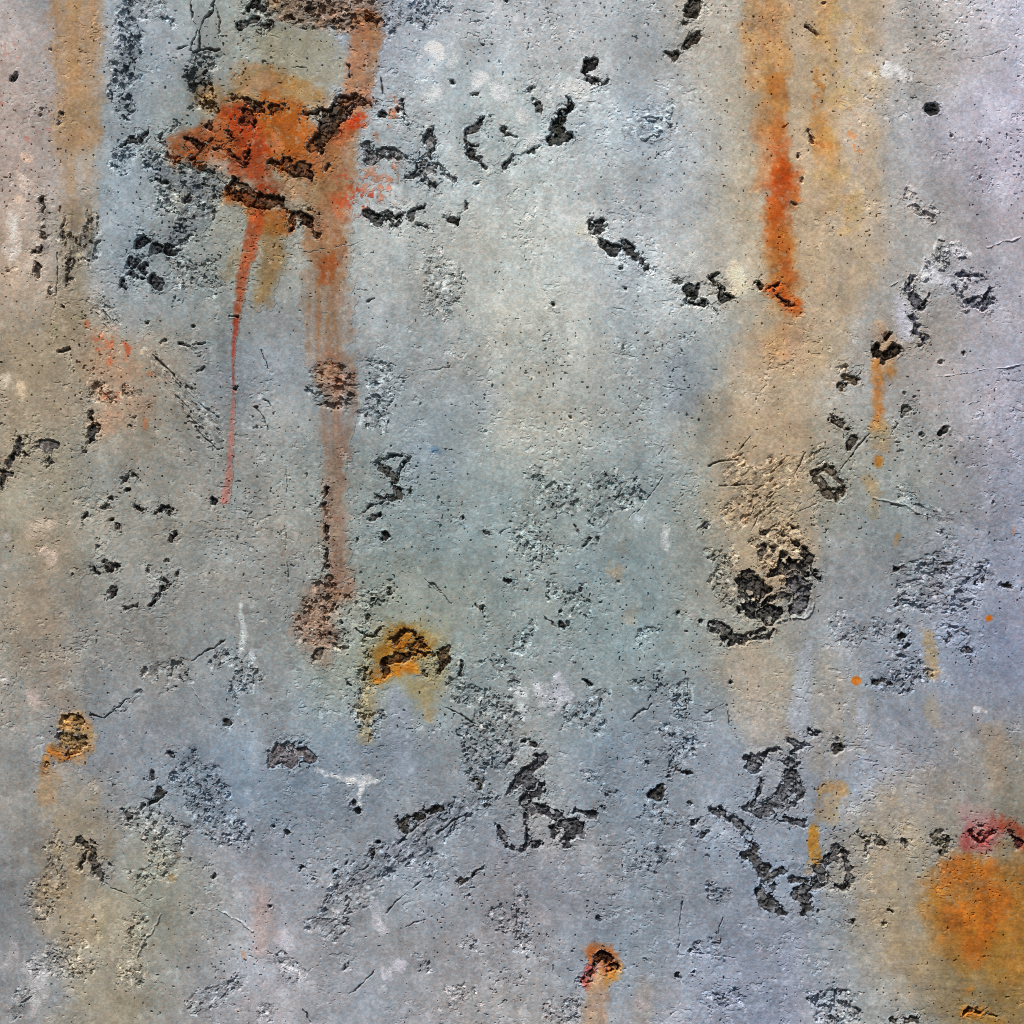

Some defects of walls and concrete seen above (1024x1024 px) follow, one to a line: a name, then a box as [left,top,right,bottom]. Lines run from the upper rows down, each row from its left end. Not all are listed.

peeling [107,93,322,309]
corrosion [164,24,405,505]
spalling [266,93,458,190]
spalling [587,215,659,277]
corrosion [733,0,883,367]
corrosion [283,392,362,672]
corrosion [370,620,439,690]
spalling [698,521,822,655]
spalling [470,735,621,856]
spalling [622,670,1024,924]
corrosion [580,939,657,1024]
corrosion [908,795,1024,1024]